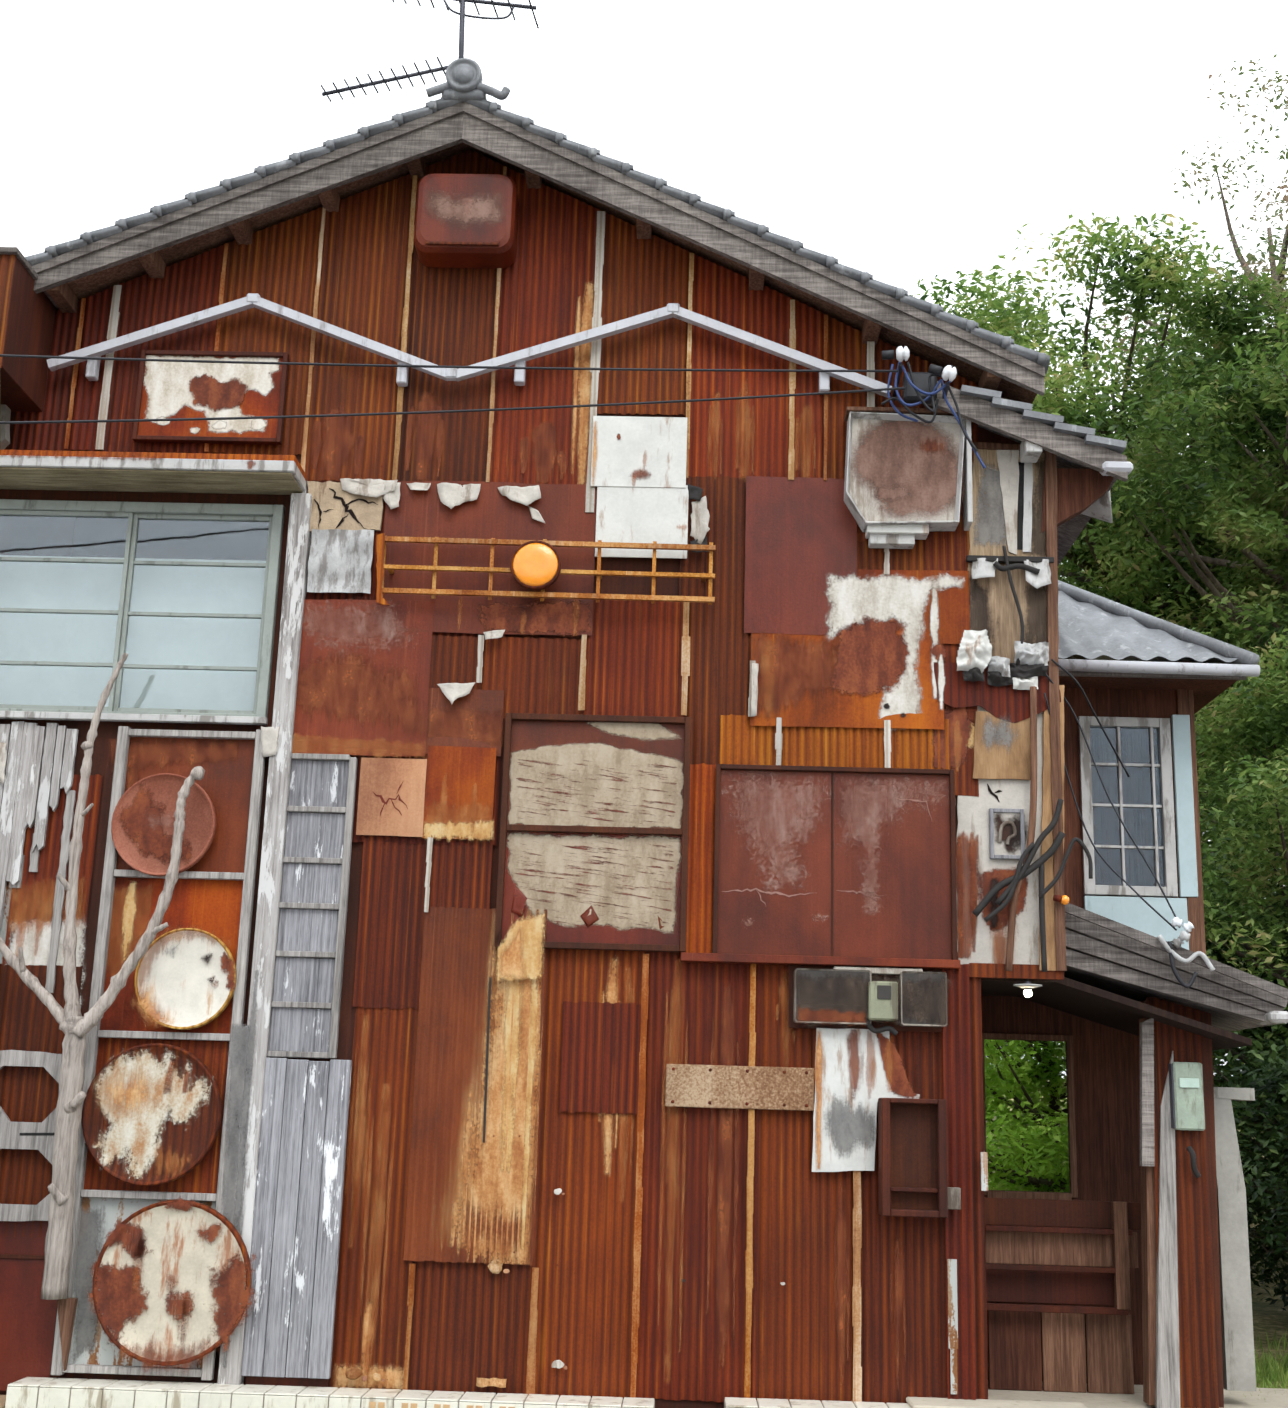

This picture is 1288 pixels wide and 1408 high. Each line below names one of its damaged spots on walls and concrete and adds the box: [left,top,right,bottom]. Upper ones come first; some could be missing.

peeling [144,355,279,433]
crack [314,488,378,530]
peeling [340,478,545,523]
peeling [826,442,1067,980]
rust [111,738,238,865]
crack [373,782,408,816]
peeling [497,722,684,981]
rust [451,922,544,1265]
rust [847,1030,860,1099]
rust [876,1033,920,1098]
rust [89,1219,257,1371]
rust [707,1108,739,1366]